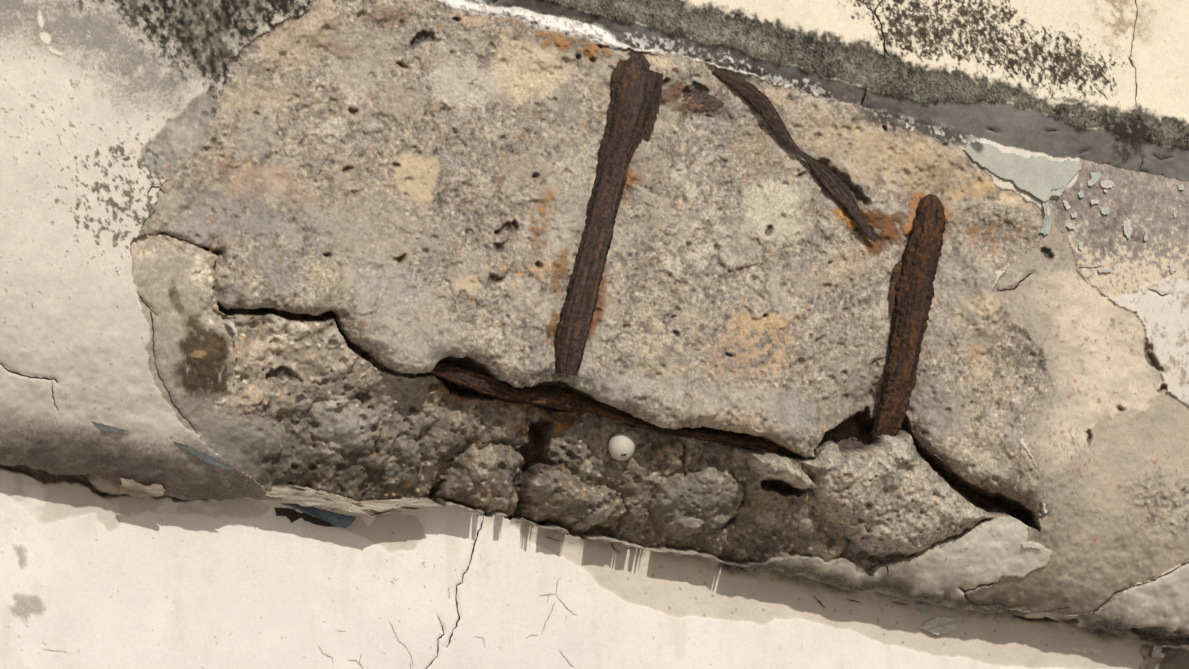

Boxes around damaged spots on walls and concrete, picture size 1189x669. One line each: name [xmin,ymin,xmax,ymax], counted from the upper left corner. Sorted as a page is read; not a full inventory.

damp [0,0,312,112]
damp [437,0,914,123]
damp [850,0,1125,98]
crack [1128,0,1138,107]
damp [1101,115,1153,159]
peeling [1078,172,1115,215]
rust [552,250,568,293]
spalling [130,0,1082,577]
crack [0,363,59,411]
peeling [964,216,1189,616]
crack [391,517,485,669]
crack [526,578,577,667]